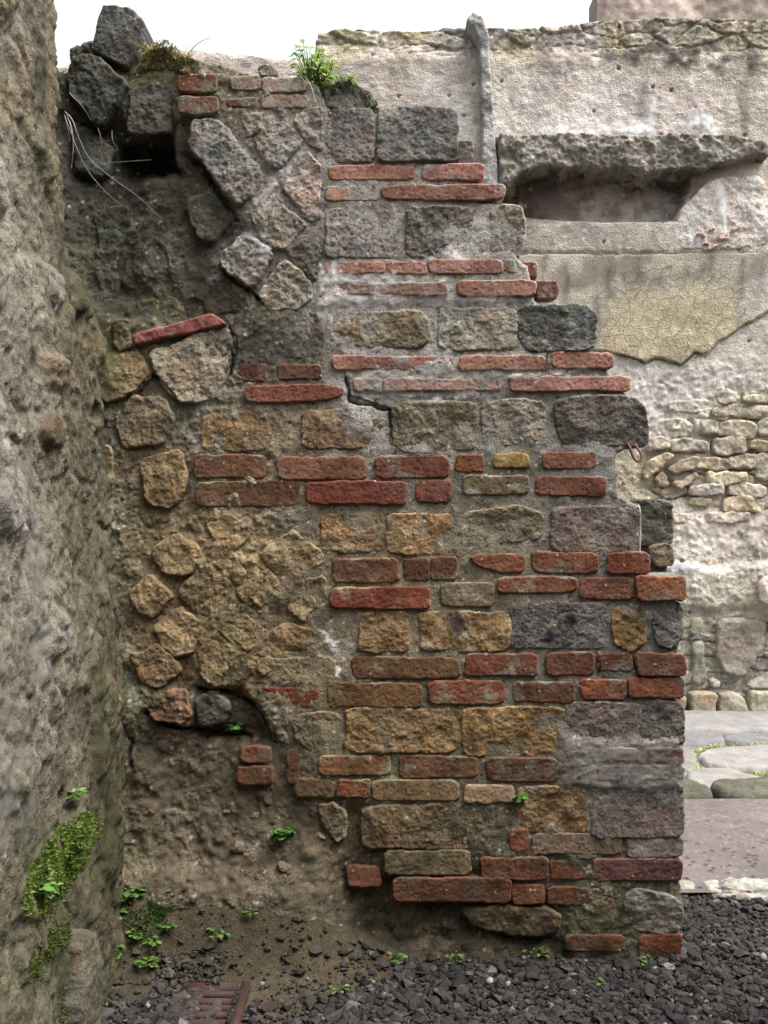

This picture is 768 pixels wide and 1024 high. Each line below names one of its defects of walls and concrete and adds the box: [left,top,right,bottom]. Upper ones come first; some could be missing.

crack [597,264,768,366]
crack [345,377,436,454]
flaking render [630,346,763,440]
flaking render [684,516,763,546]